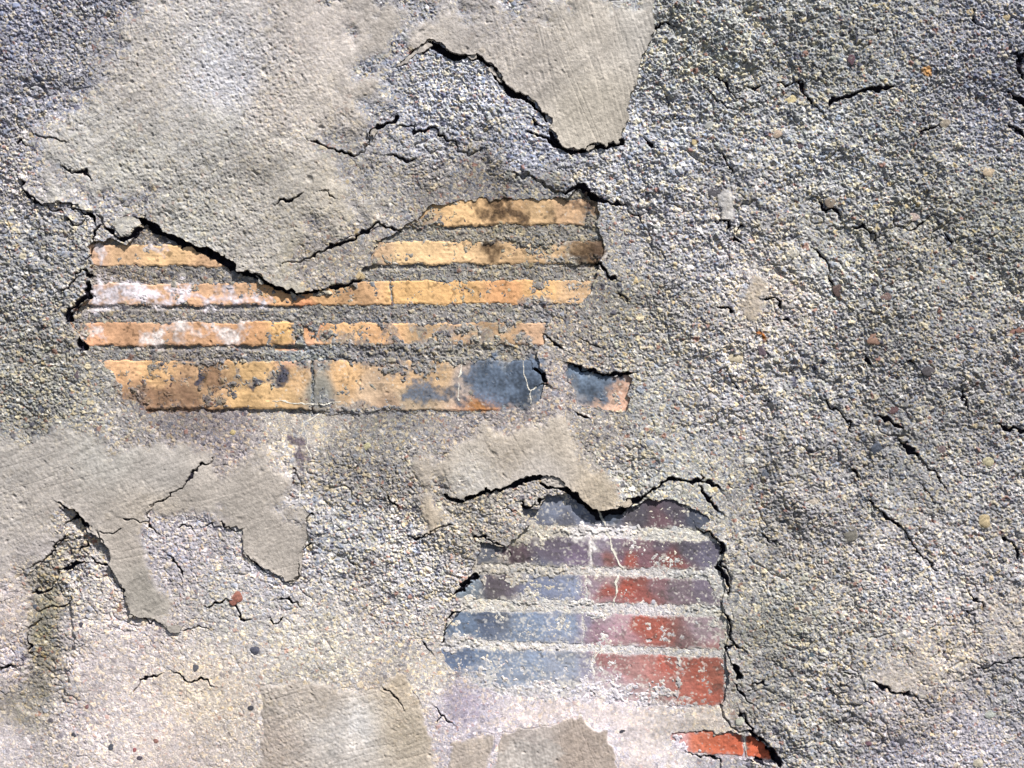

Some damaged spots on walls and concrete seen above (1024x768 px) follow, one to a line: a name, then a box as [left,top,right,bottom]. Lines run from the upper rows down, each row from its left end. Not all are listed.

flaking render [391,31,629,155]
crack [51,137,91,178]
crack [388,125,458,163]
crack [562,182,643,224]
crack [306,222,401,259]
crack [22,180,148,352]
spalling [70,189,605,418]
spalling [565,363,633,412]
crack [33,462,235,607]
crack [207,597,295,624]
spalling [438,465,729,711]
spalling [670,729,776,762]